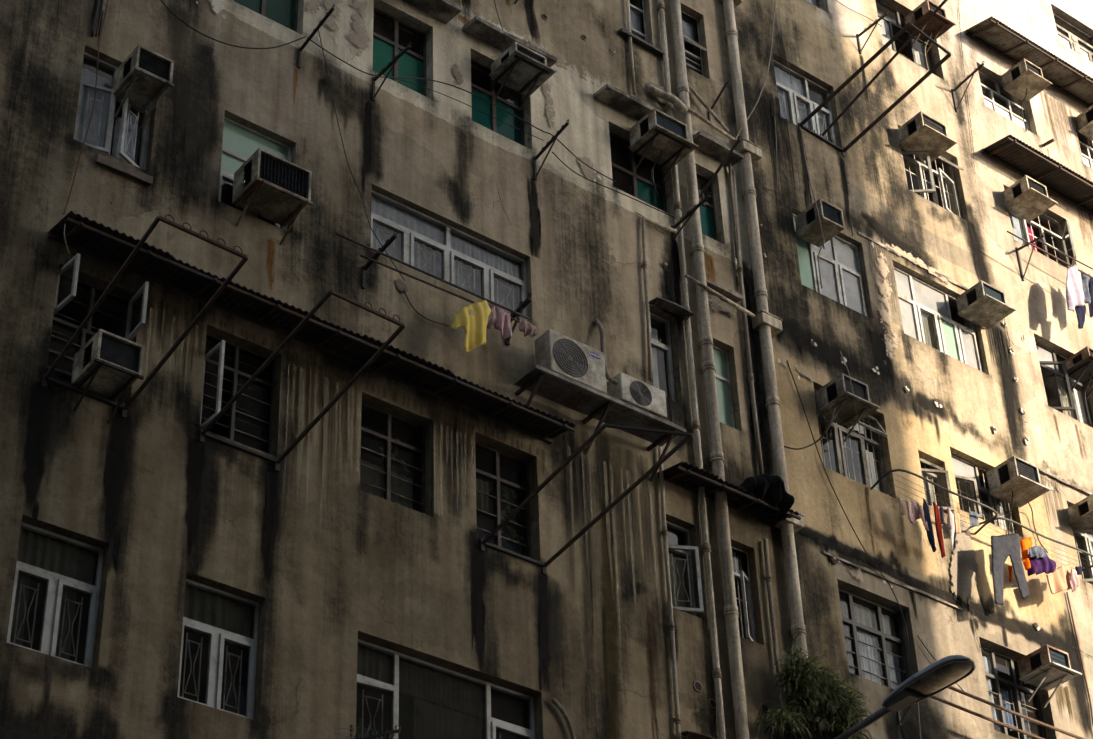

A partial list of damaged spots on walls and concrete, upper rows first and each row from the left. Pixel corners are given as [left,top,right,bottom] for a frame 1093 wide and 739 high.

peeling [196,0,226,19]
peeling [318,0,371,56]
damp [759,88,812,208]
damp [776,318,894,380]
damp [840,158,922,265]
peeling [871,241,958,362]
damp [914,393,948,439]
damp [967,220,989,284]
damp [987,325,1017,450]
damp [185,438,205,554]
damp [471,546,485,669]
damp [798,526,1091,733]